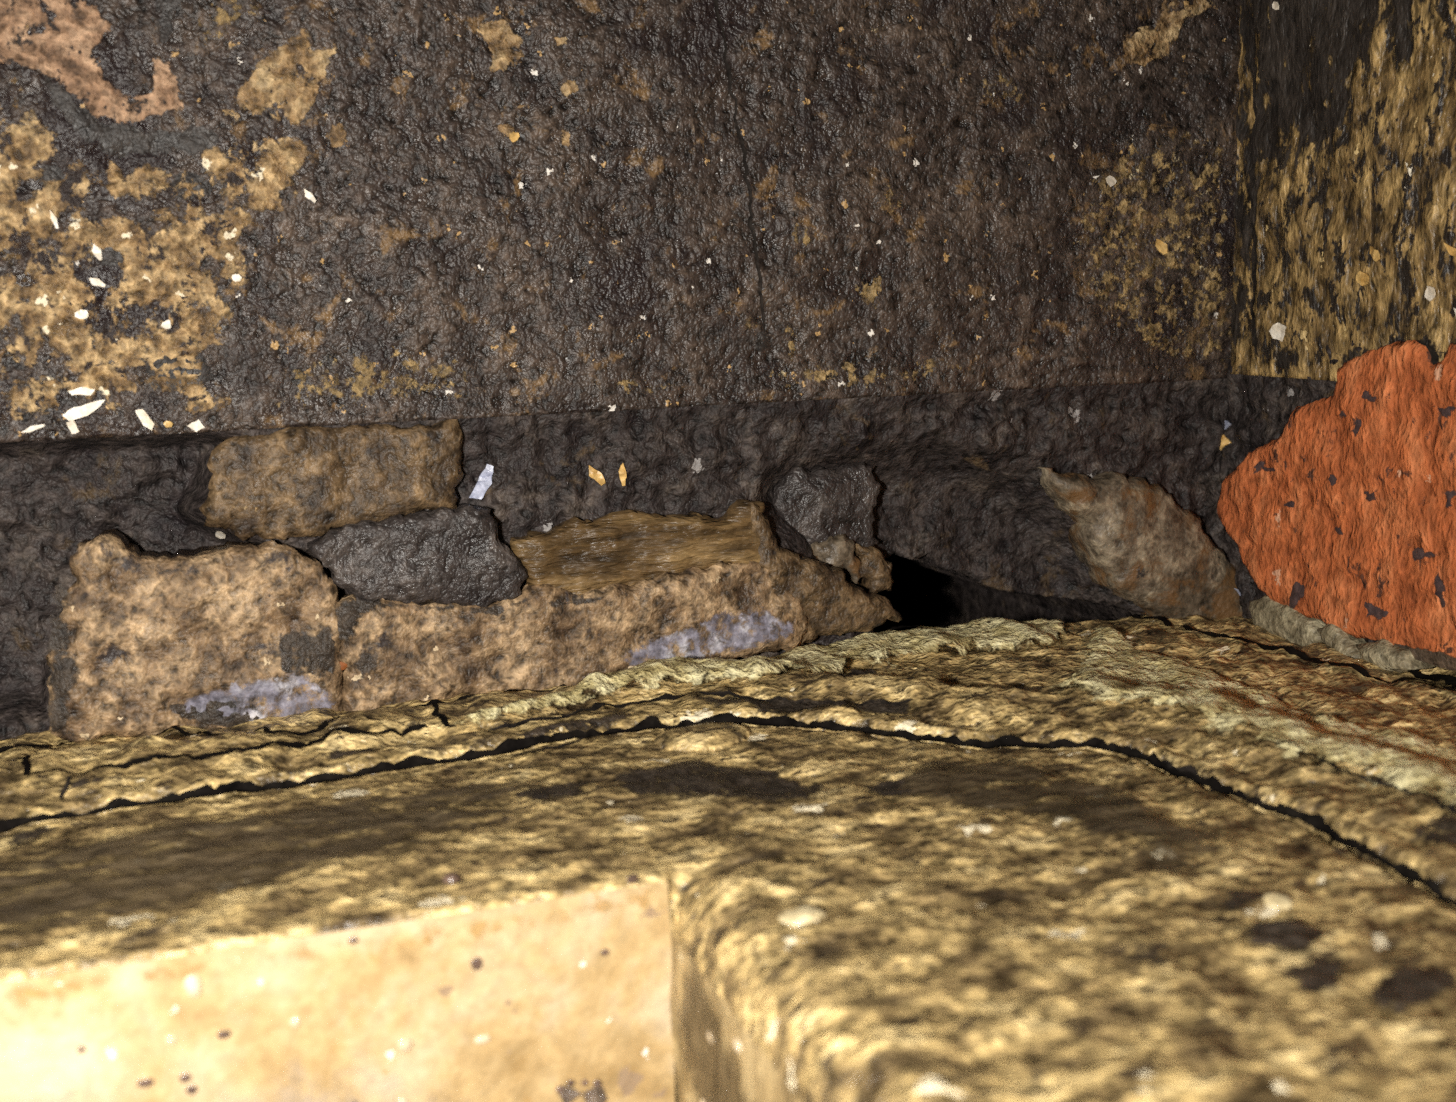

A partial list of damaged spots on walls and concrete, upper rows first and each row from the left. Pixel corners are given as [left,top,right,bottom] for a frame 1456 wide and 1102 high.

crack [0,684,1456,908]